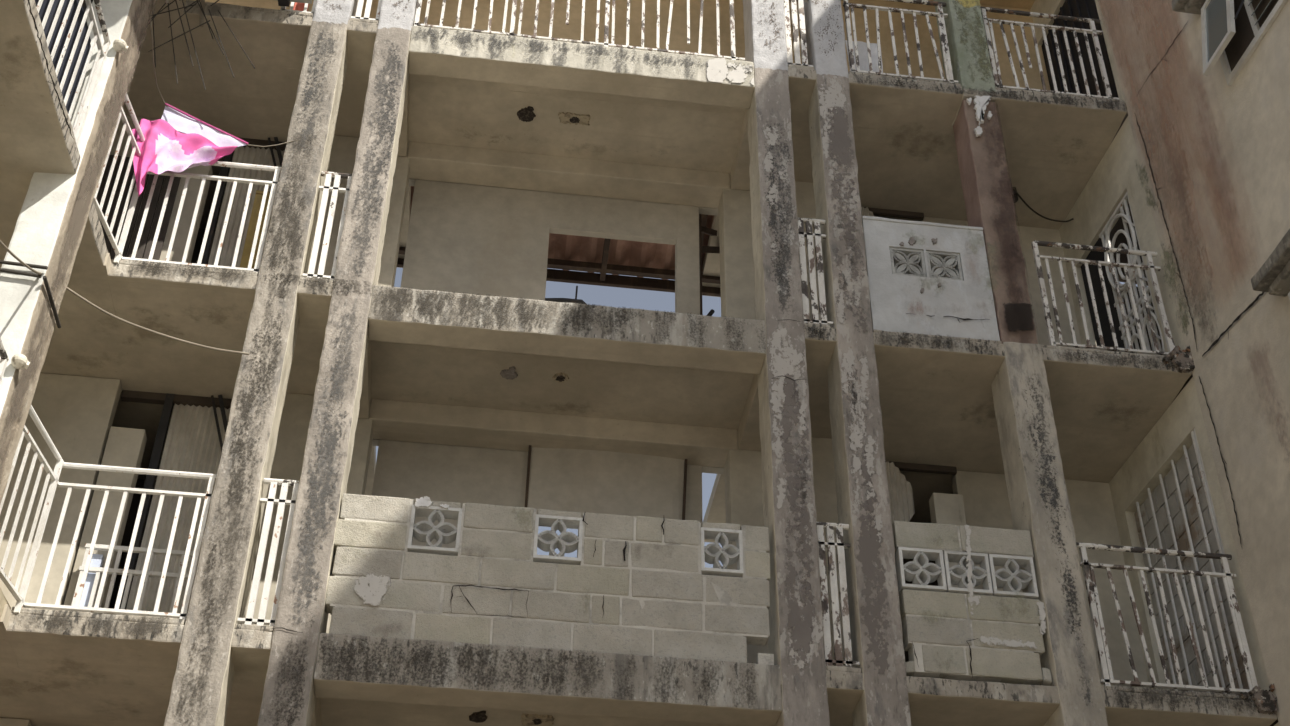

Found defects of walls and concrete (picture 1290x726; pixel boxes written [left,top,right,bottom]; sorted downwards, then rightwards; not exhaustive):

leakage [412,27,708,80]
leakage [860,78,1127,109]
leakage [132,260,252,277]
leakage [177,133,672,726]
peeling [767,324,814,545]
peeling [840,347,883,543]
leakage [1026,378,1066,552]
crack [450,585,529,618]
peeling [789,596,823,669]
leakage [1062,572,1085,645]